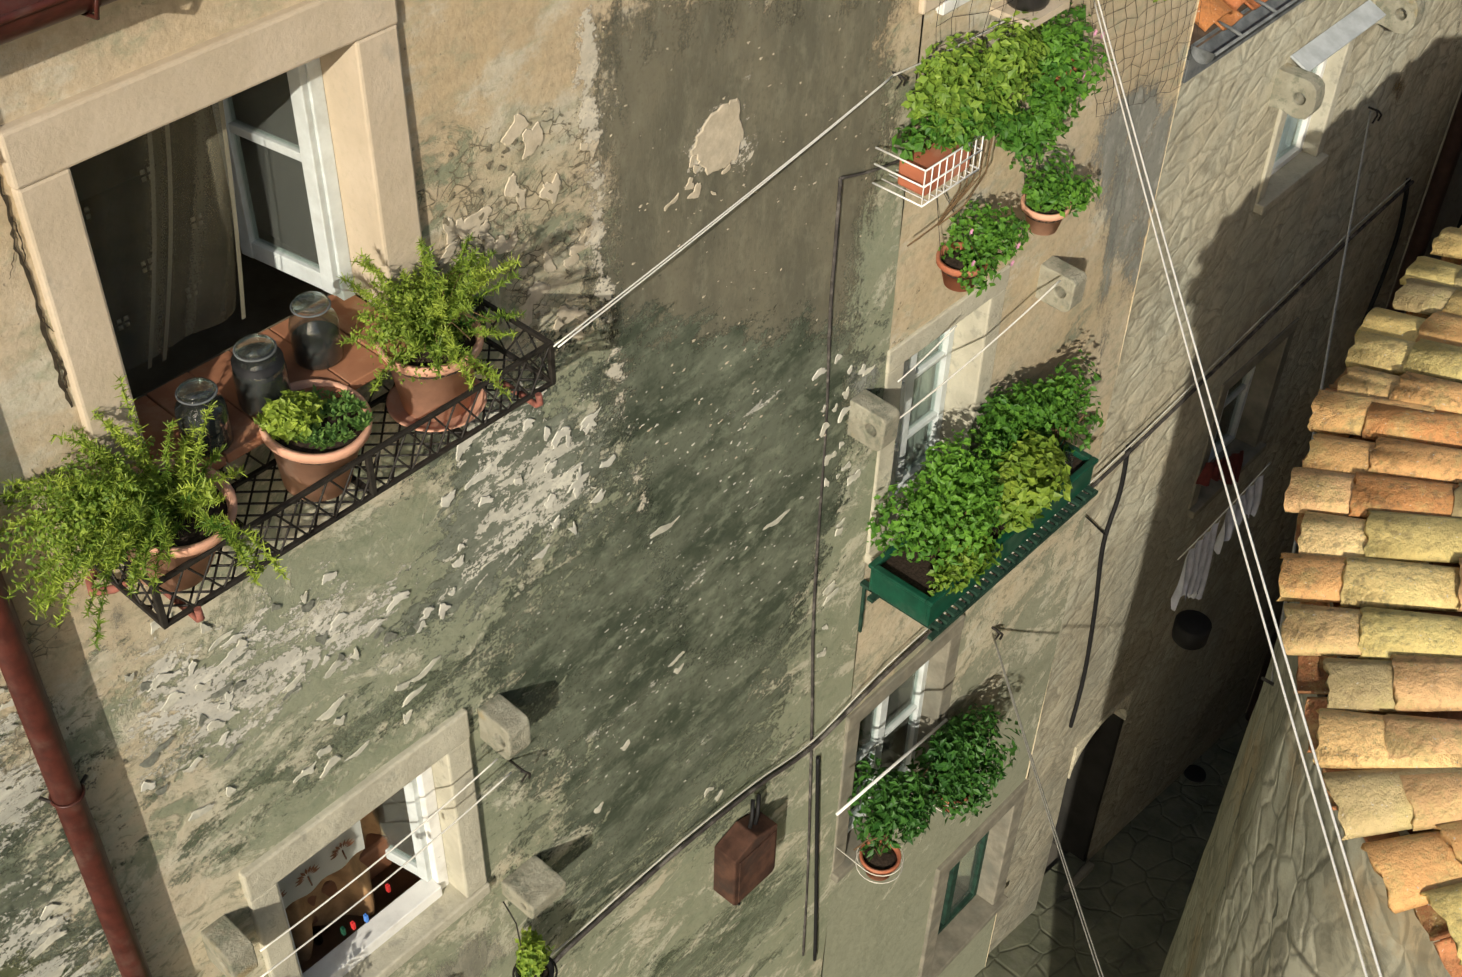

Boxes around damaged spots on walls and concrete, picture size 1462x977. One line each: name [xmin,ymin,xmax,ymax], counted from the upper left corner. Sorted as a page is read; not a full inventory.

peeling [664,98,758,211]
damp [572,0,910,457]
damp [1091,83,1175,303]
crack [0,177,73,408]
peeling [100,112,633,795]
damp [631,468,648,512]
peeling [650,516,680,539]
peeling [763,509,790,530]
damp [0,715,48,865]
damp [143,734,202,810]
peeling [29,904,68,959]
damp [0,872,115,977]